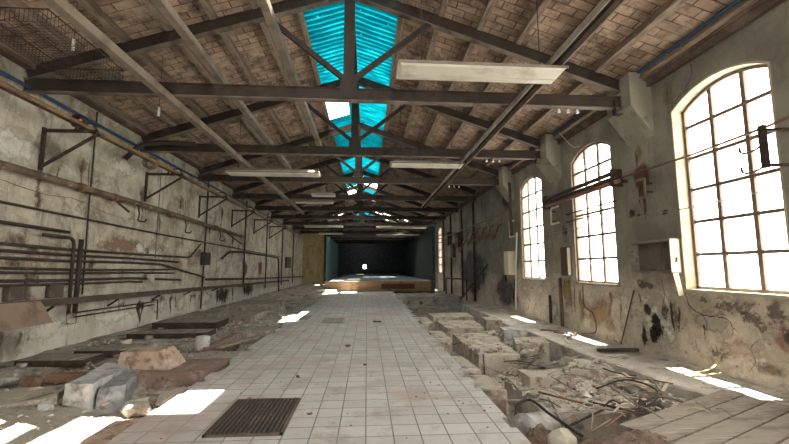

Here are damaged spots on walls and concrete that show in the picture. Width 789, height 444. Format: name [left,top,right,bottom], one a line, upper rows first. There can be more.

peeling [95,233,167,262]
damp [216,288,233,303]
damp [497,275,515,306]
spalling [635,280,789,356]
crack [685,276,758,373]